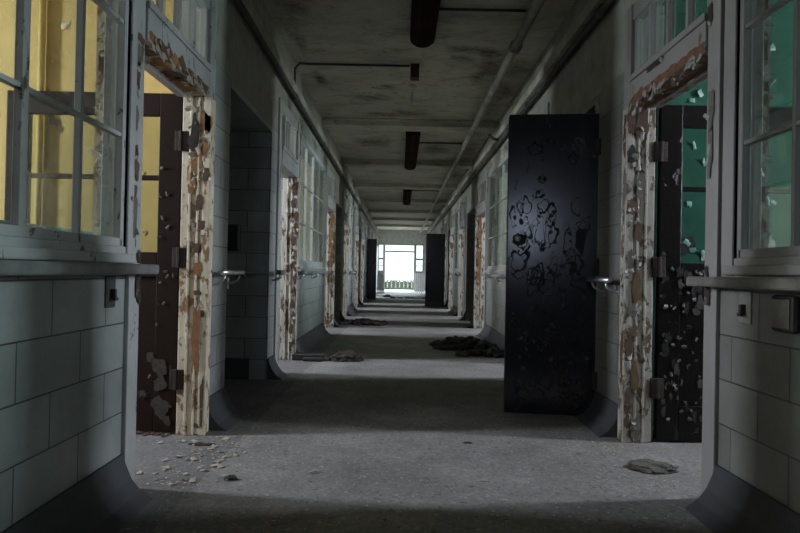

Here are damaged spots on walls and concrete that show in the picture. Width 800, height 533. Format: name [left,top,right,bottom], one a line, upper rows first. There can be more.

peeling [132,145,147,238]
peeling [136,31,213,276]
peeling [621,42,714,242]
peeling [284,182,299,347]
peeling [660,236,710,316]
peeling [139,352,172,427]
peeling [191,357,204,429]
peeling [619,249,645,441]
peeling [659,332,703,424]